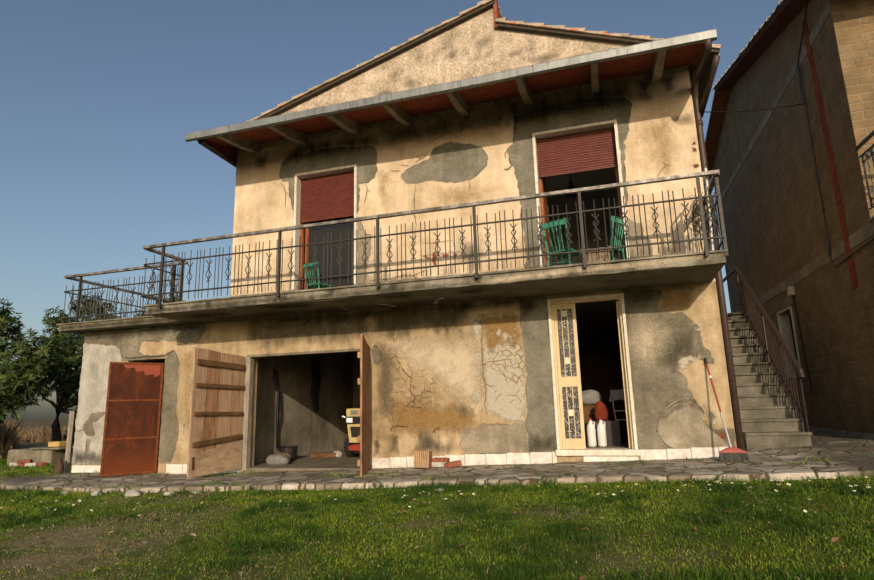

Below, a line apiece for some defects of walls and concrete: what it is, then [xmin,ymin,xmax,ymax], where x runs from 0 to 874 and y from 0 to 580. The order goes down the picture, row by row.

flaking render [72,343,121,465]
crack [381,352,441,433]
peeling [460,316,527,421]
spalling [678,356,701,369]